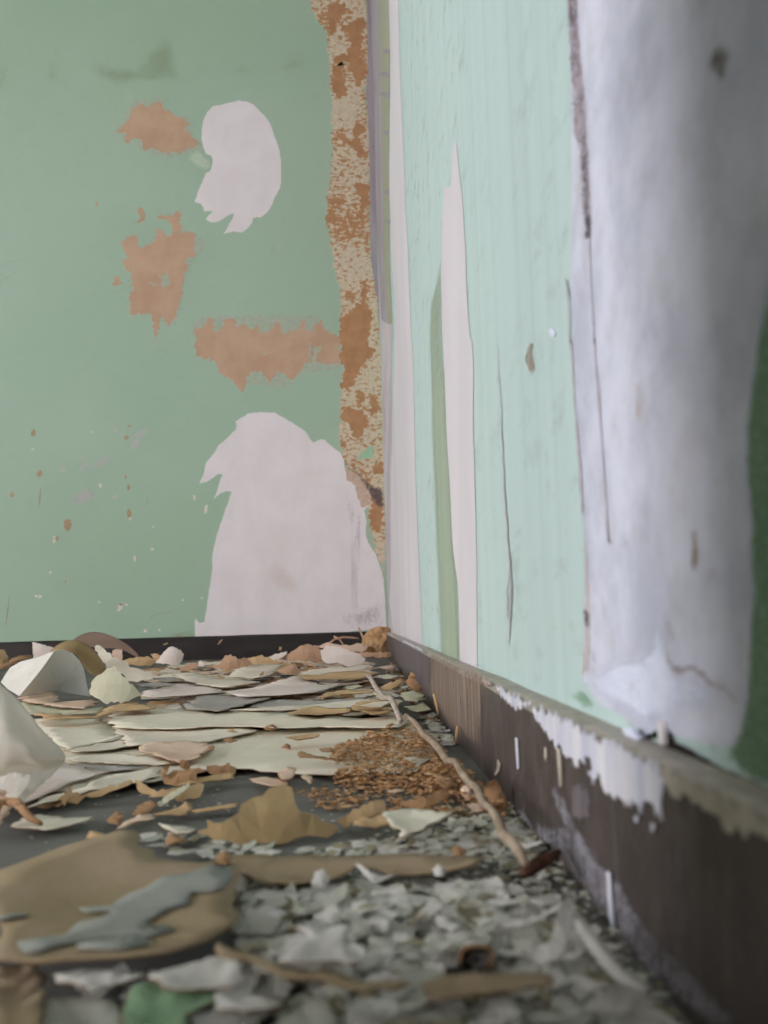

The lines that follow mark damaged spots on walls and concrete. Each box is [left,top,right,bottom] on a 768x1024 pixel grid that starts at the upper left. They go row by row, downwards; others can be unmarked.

peeling [112,207,205,348]
peeling [112,97,281,234]
peeling [191,0,768,840]
crack [497,343,512,644]
peeling [53,775,640,1024]